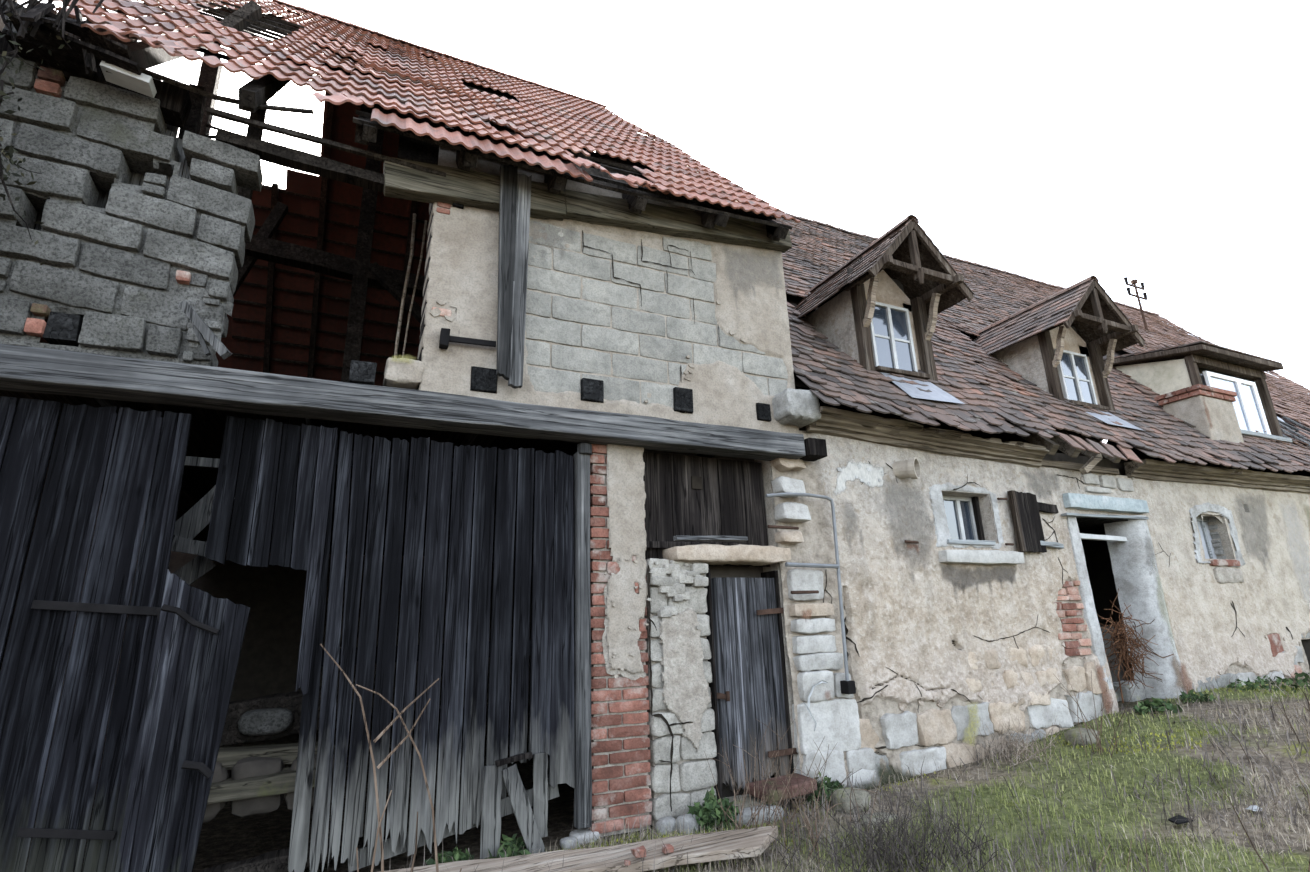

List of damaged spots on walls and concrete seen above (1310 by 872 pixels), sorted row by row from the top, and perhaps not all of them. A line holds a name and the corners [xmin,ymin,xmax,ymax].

flaking render [525,221,788,413]
spalling [602,556,709,680]
crack [823,574,973,713]
flaking render [859,575,1109,776]